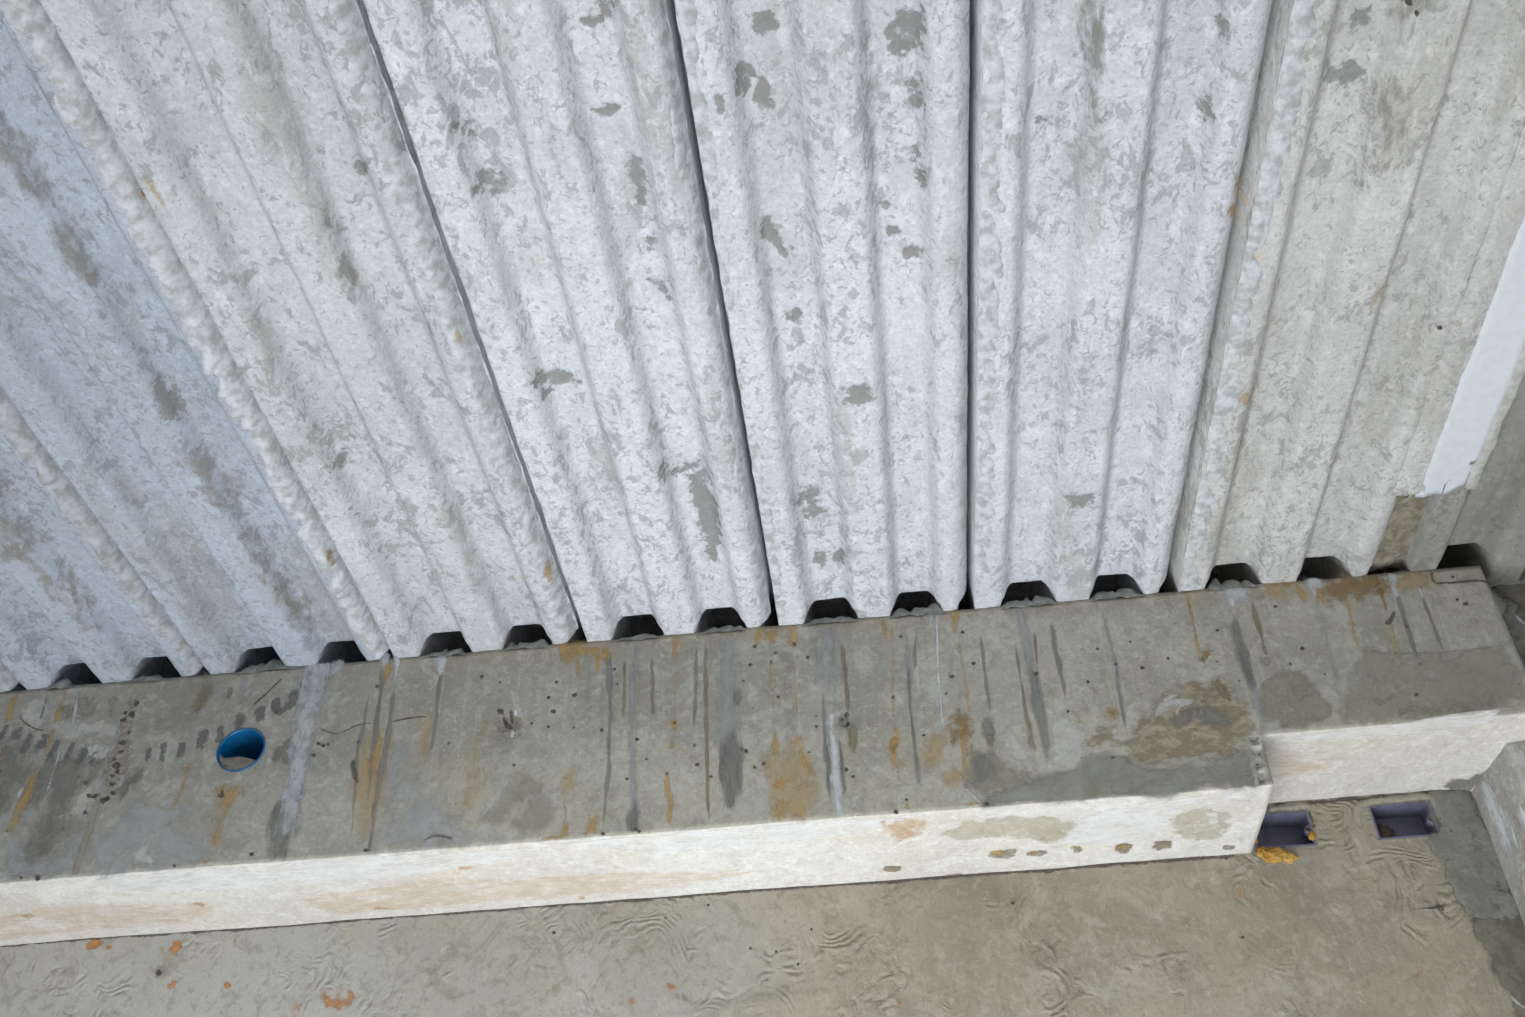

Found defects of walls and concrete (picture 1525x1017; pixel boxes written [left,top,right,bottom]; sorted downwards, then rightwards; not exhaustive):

rust [1274,574,1422,651]
leakage [271,660,343,858]
leakage [693,639,742,812]
leakage [819,627,850,815]